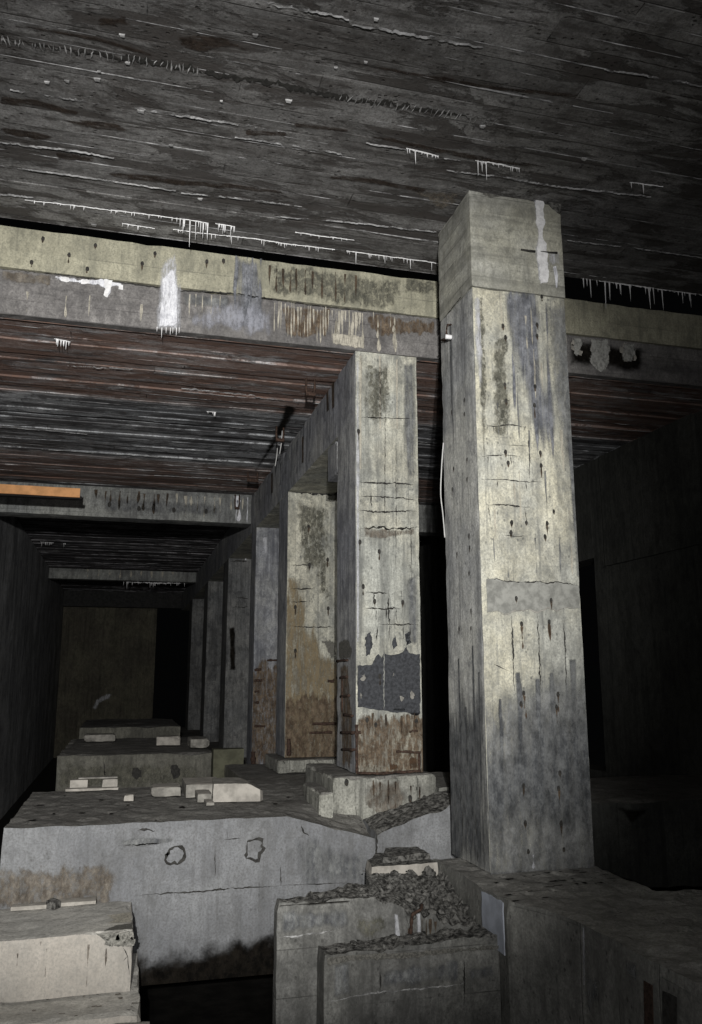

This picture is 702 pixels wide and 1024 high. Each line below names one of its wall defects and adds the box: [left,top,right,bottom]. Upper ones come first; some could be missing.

leakage [3,271,123,316]
efflorescence [535,200,558,288]
leakage [608,347,641,370]
leakage [156,256,433,643]
leakage [475,292,592,575]
rust [252,579,423,772]
peeling [309,632,421,775]